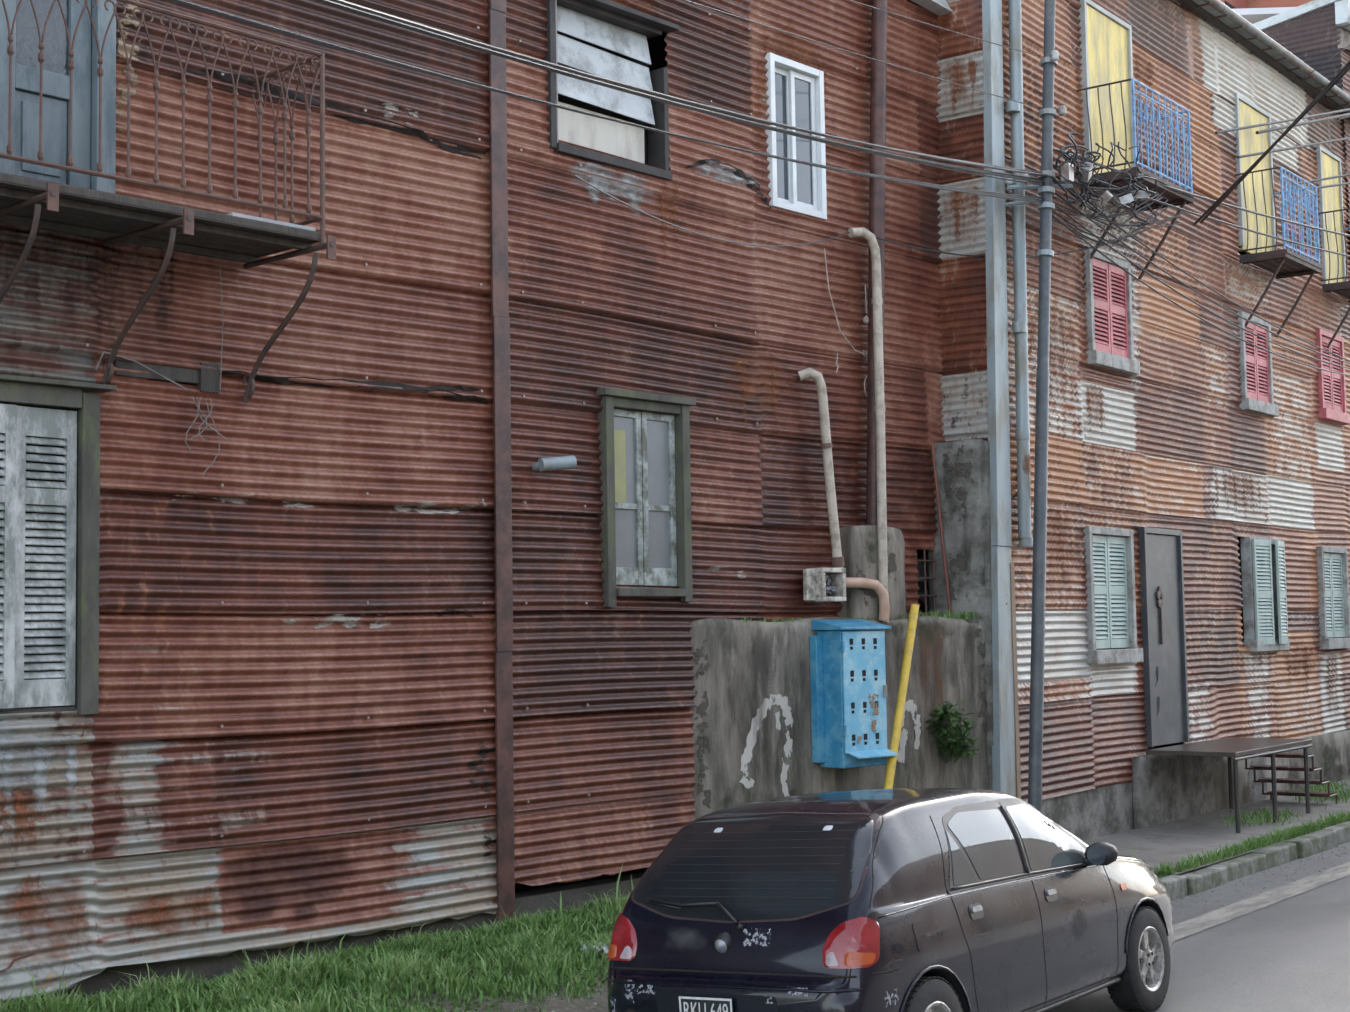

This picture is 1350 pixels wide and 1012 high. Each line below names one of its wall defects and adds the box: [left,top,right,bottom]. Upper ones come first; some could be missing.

rust [1326,658,1337,706]
rust [464,742,496,797]
rust [0,788,34,848]
rust [5,878,88,956]
rust [129,887,211,933]